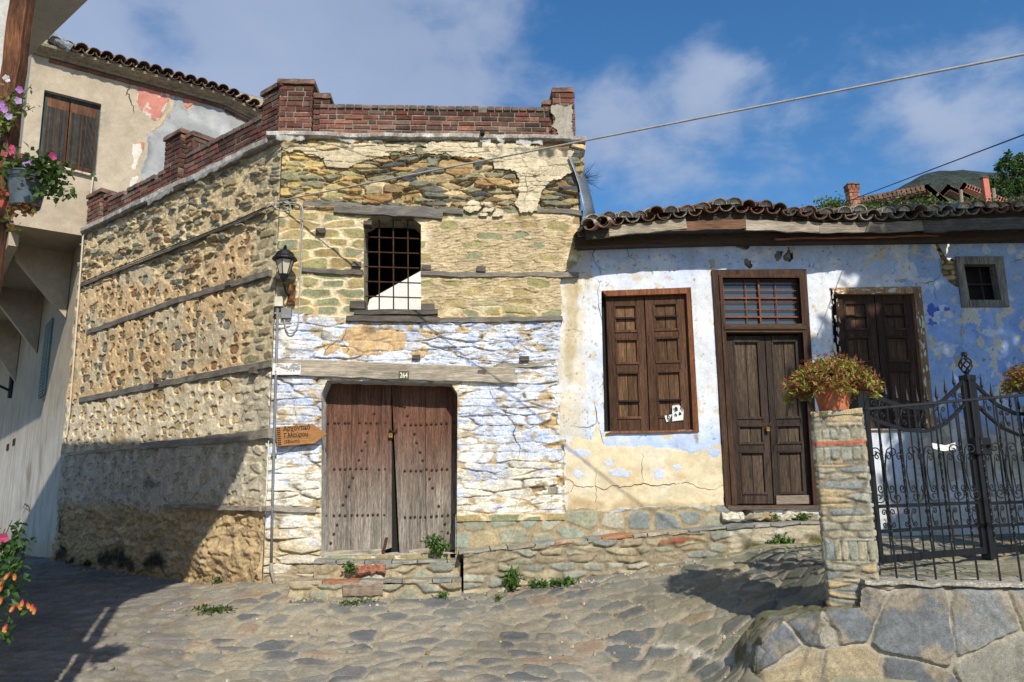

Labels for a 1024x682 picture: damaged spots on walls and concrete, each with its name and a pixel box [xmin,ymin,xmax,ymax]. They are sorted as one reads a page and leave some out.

flaking render [137,83,169,121]
flaking render [130,142,145,187]
flaking render [281,140,574,214]
flaking render [463,200,503,217]
spalling [935,244,956,286]
flaking render [322,322,469,360]
crack [562,373,717,502]
peeling [530,422,725,512]